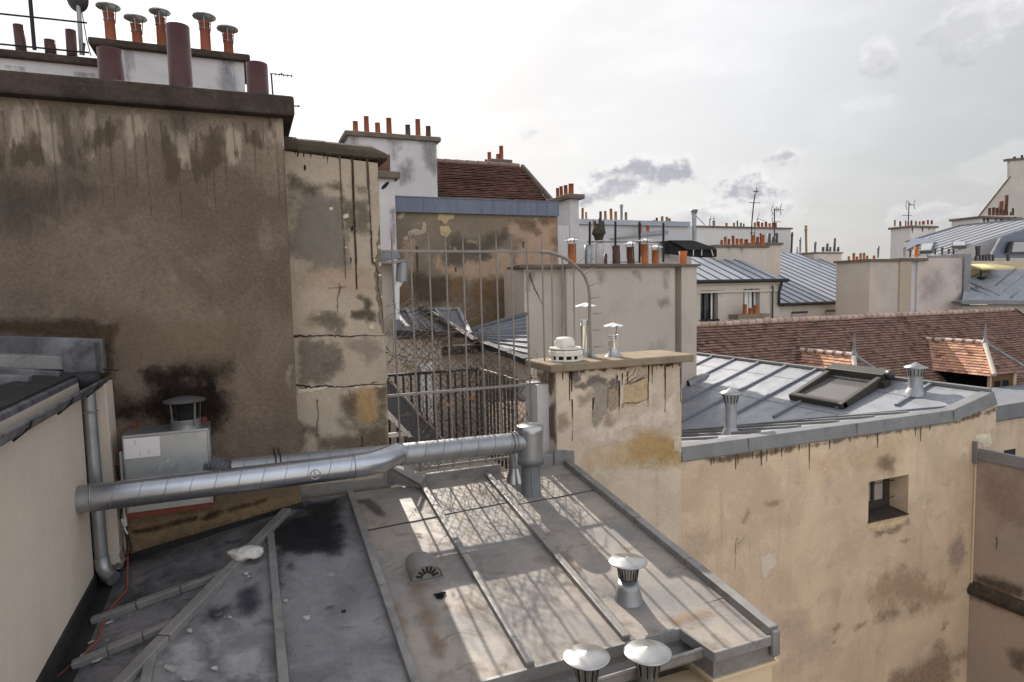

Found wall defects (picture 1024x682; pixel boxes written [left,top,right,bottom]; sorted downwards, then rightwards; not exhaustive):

damp [0,101,150,168]
damp [162,118,376,331]
peeling [400,214,558,283]
crack [294,283,384,338]
damp [298,385,388,449]